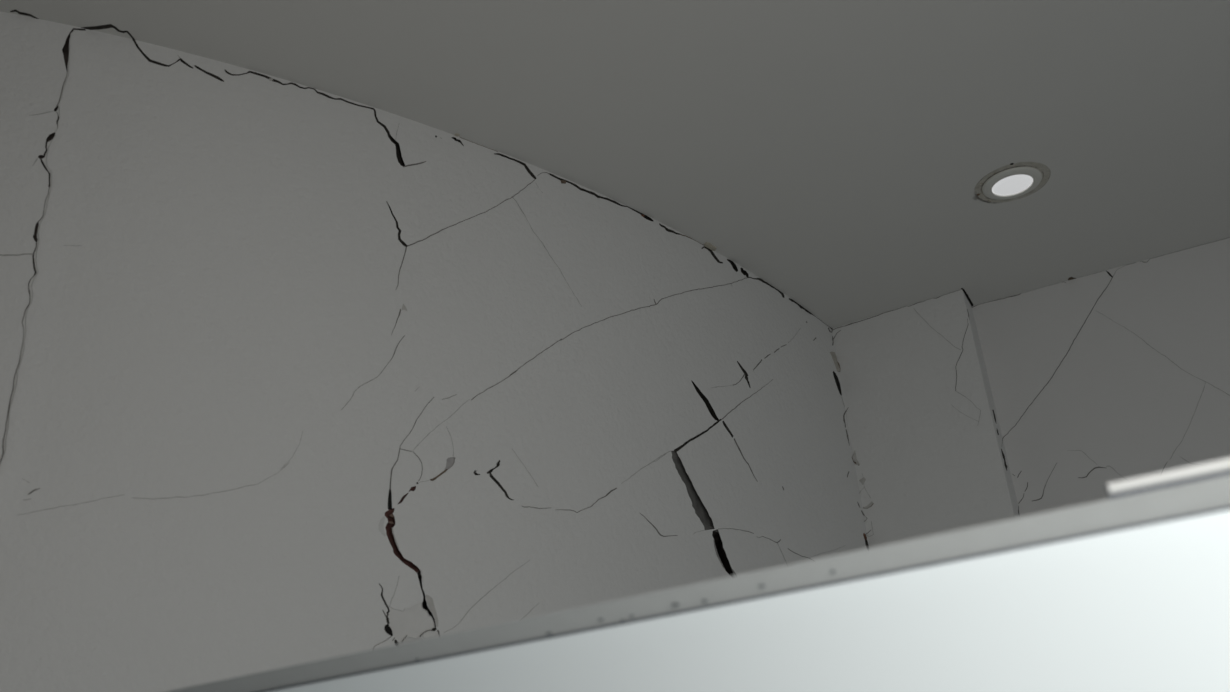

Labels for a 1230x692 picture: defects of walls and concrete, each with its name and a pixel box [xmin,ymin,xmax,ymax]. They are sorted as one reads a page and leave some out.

crack [10,9,38,19]
crack [0,24,426,549]
spalling [373,578,440,649]
crack [341,133,1230,633]